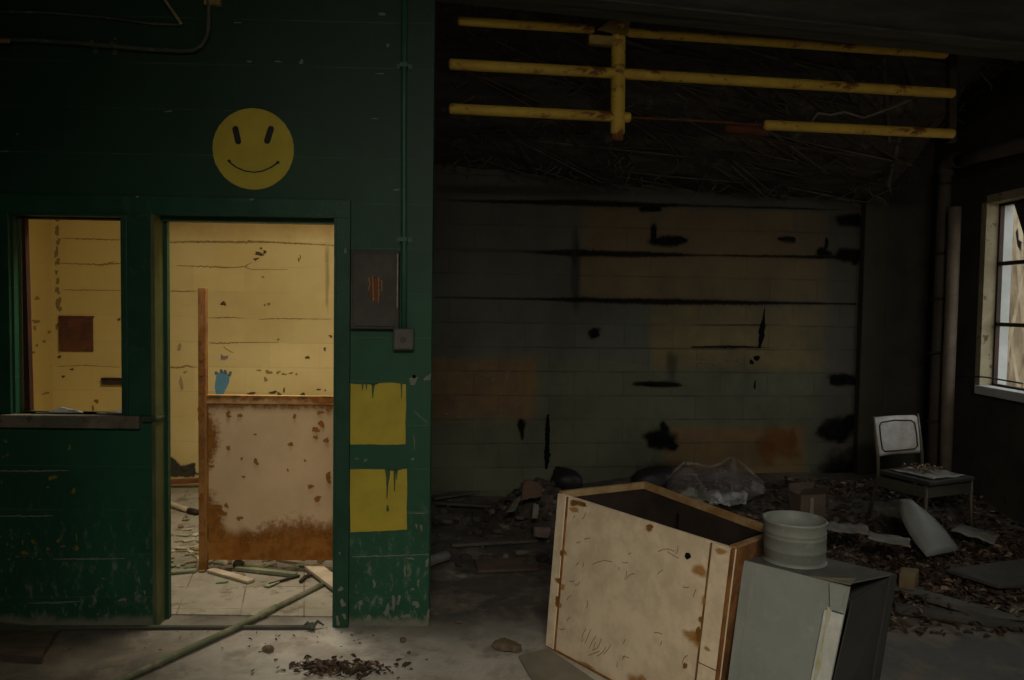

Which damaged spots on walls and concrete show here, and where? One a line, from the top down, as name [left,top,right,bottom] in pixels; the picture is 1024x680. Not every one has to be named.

peeling [32,220,62,354]
crack [465,297,856,348]
peeling [256,370,297,395]
crack [543,414,551,469]
corrosion [198,493,333,570]
peeling [336,557,430,626]